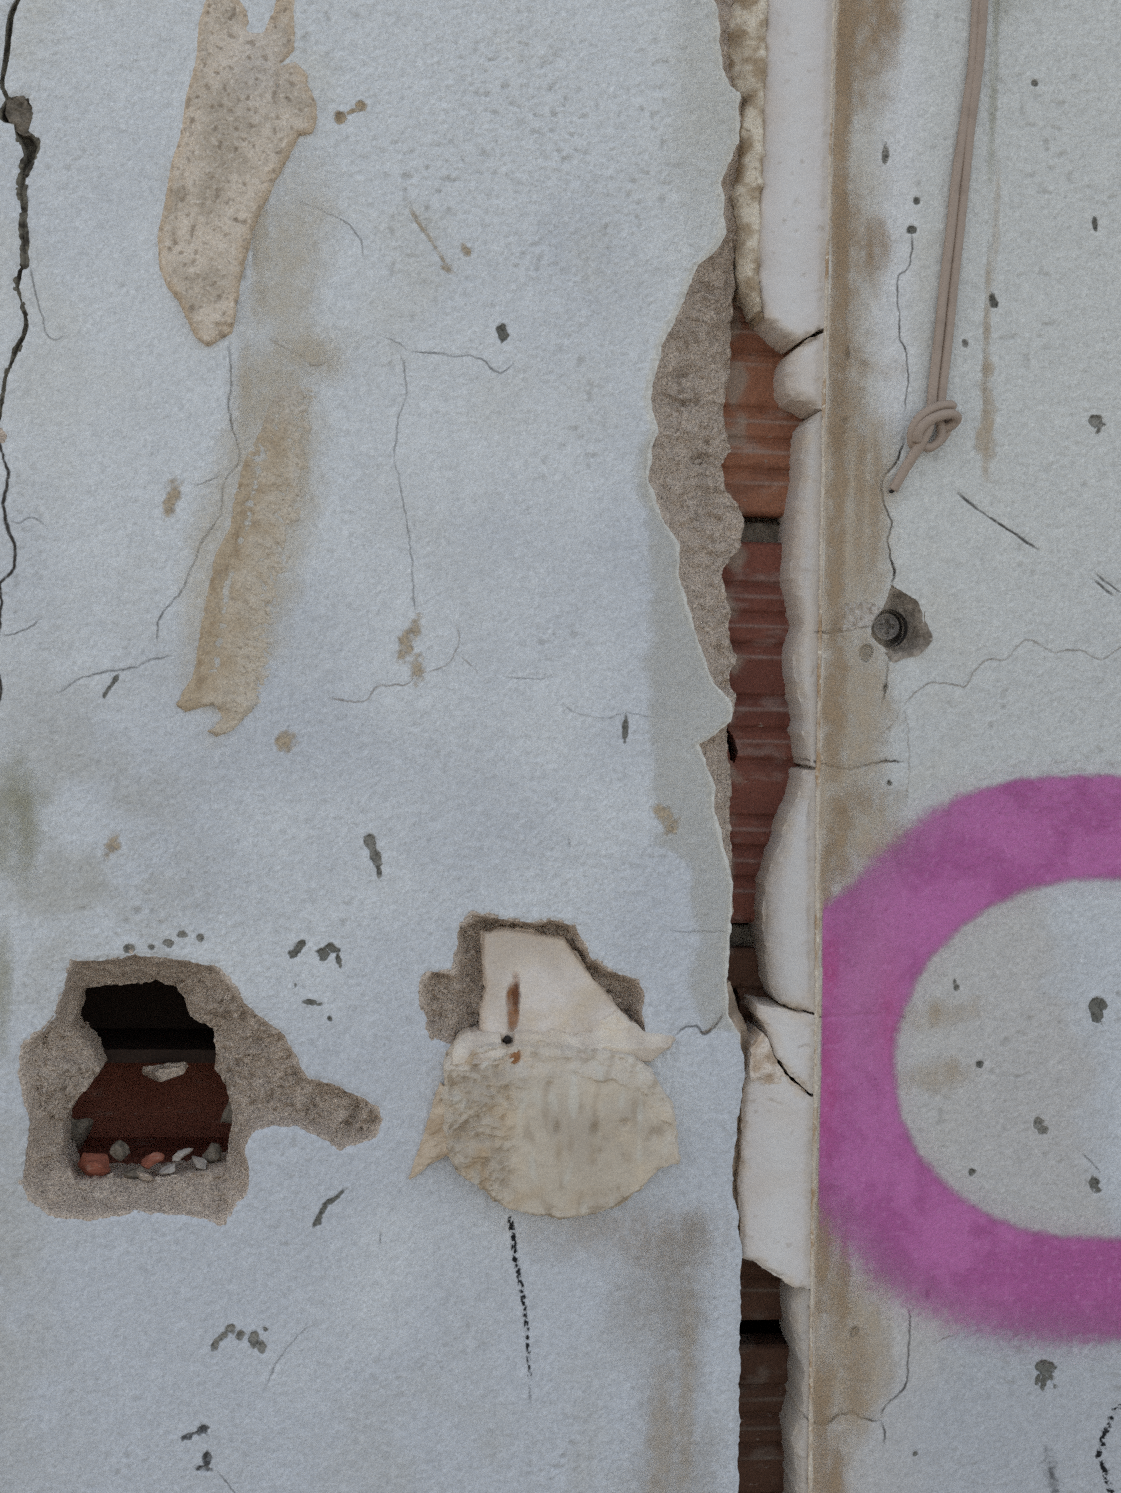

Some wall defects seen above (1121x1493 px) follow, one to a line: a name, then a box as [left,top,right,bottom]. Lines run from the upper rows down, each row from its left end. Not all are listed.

crack [0,0,41,629]
flaking render [648,0,767,914]
leakage [826,426,886,607]
flaking render [833,585,933,663]
leakage [821,648,886,857]
spalling [17,931,383,1226]
rust [507,984,519,1028]
flaking render [418,911,645,1044]
flaking render [732,1113,740,1207]
spalling [727,980,806,1093]